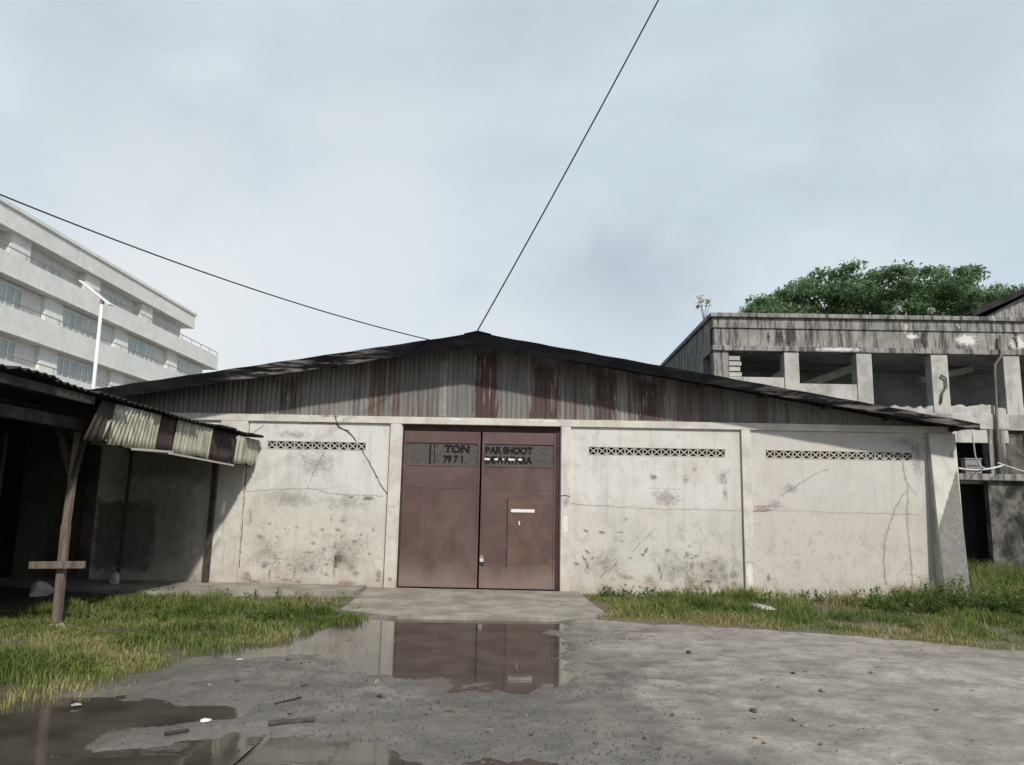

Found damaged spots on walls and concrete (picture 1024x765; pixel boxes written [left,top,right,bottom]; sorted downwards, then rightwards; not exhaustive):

water stain [767,329,796,344]
peeling [955,334,978,346]
rust [473,355,500,417]
rust [527,366,563,419]
rust [614,382,666,420]
crack [301,417,387,494]